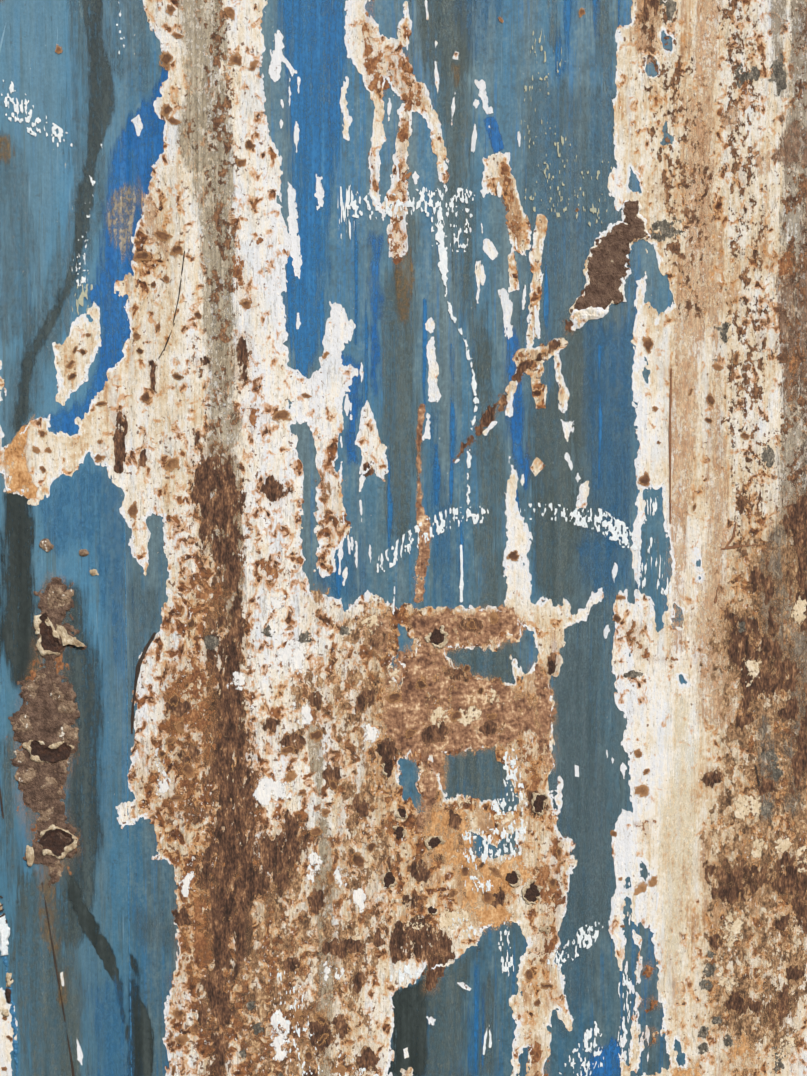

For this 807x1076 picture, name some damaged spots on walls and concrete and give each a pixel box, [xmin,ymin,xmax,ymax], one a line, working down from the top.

rust [94,411,147,474]
peeling [0,0,605,1076]
rust [133,0,566,1076]
peeling [337,0,807,1076]